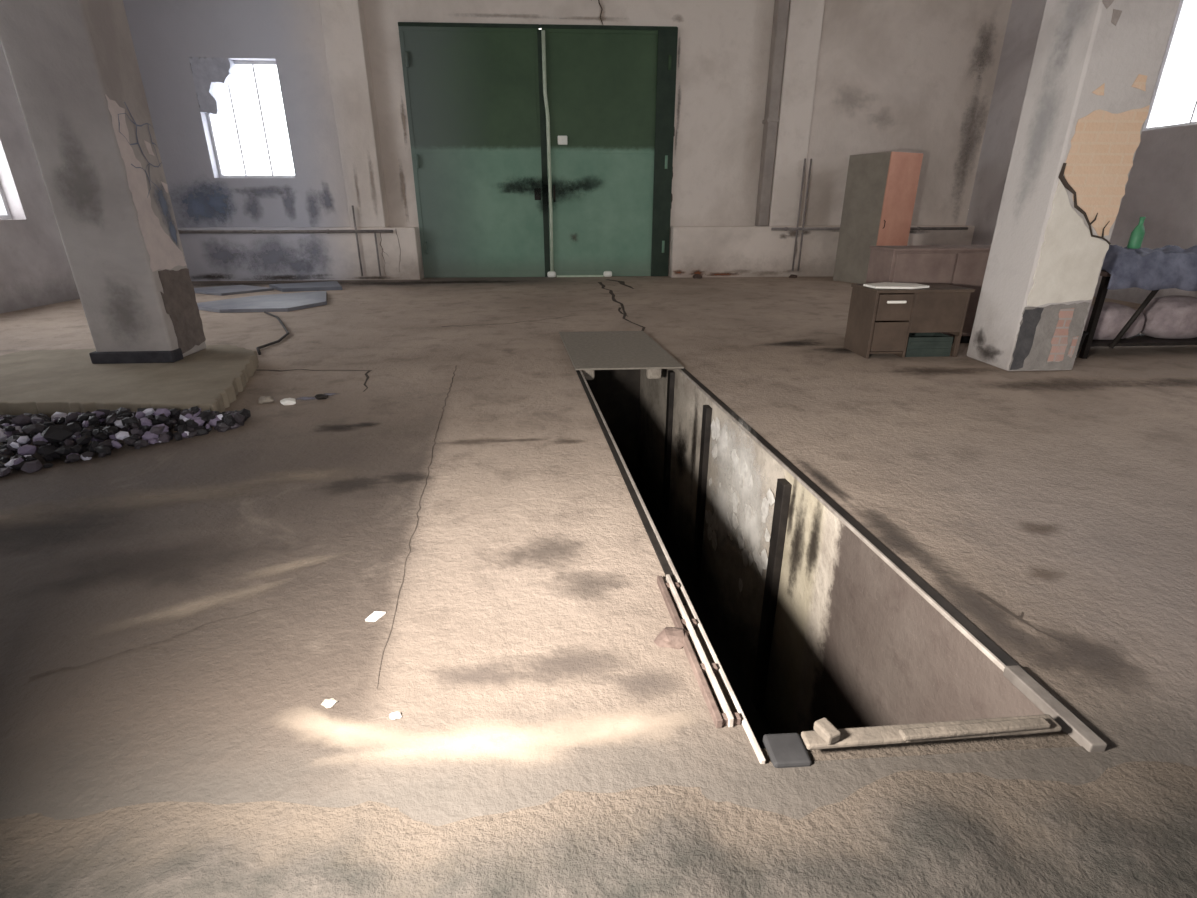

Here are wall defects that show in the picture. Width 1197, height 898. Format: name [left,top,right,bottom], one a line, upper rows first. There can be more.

peeling [1064,74,1150,236]
leakage [248,188,293,216]
leakage [203,244,320,286]
leakage [356,277,514,285]
crack [598,279,646,331]
spalling [1009,302,1090,371]
leakage [787,486,819,583]